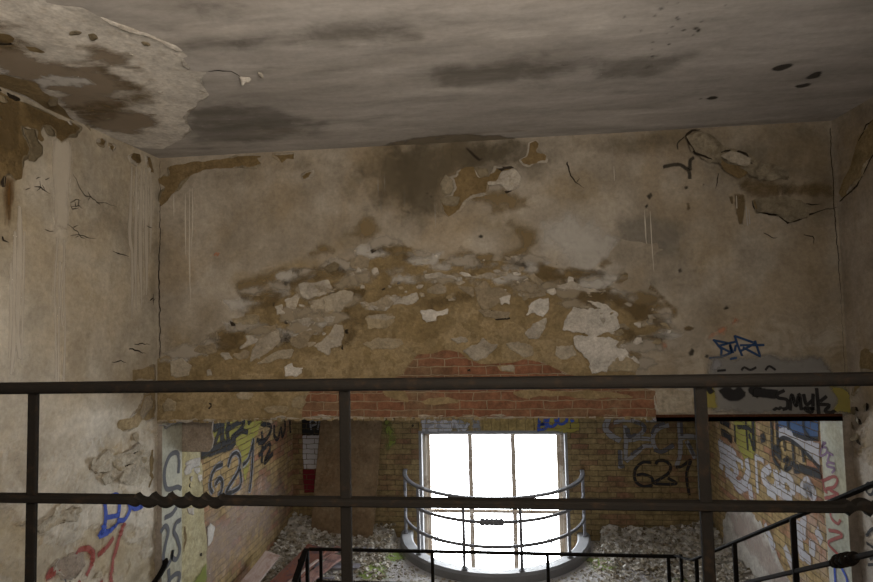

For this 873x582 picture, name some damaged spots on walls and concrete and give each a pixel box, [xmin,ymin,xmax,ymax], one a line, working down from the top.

peeling [0,0,261,206]
damp [380,134,513,227]
flaking render [426,140,548,217]
damp [53,139,71,382]
crack [148,165,161,358]
flaking render [113,235,682,381]
flaking render [89,391,339,487]
flaking render [350,388,658,429]
flaking render [37,504,83,534]